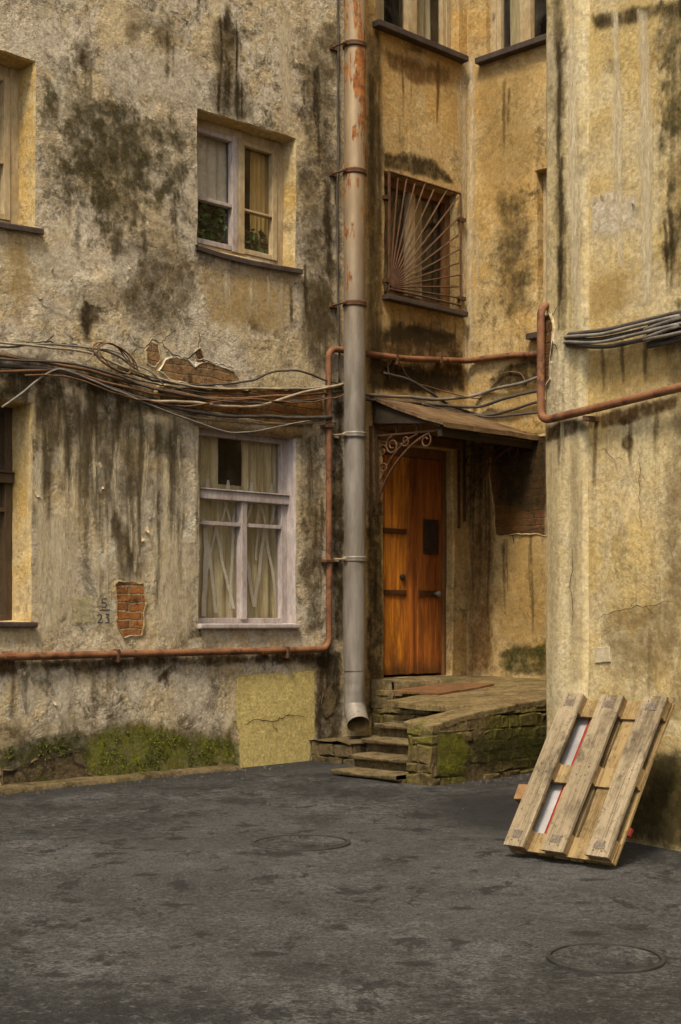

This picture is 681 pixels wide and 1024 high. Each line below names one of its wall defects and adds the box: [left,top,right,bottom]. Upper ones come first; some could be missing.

water stain [39,44,193,327]
water stain [210,6,246,117]
water stain [211,12,337,370]
water stain [368,30,530,407]
water stain [593,0,681,300]
water stain [0,357,205,641]
flaking render [111,579,147,639]
flaking render [145,342,325,426]
crack [247,714,306,730]
flaking render [489,433,548,538]
water stain [468,397,677,671]
crack [565,557,670,619]